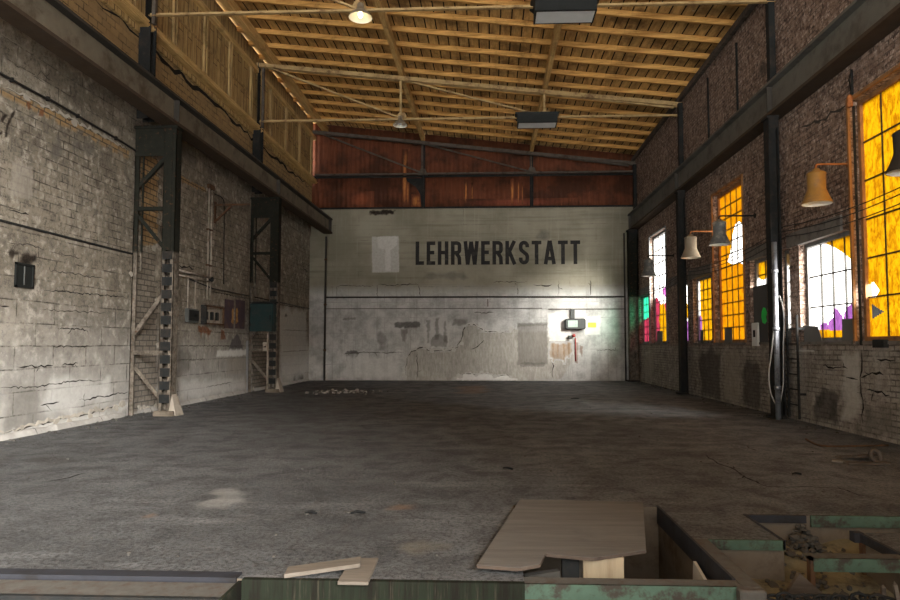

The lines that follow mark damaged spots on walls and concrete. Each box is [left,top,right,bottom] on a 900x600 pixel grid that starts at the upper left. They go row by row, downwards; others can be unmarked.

crack [2,241,127,409]
spalling [401,322,575,381]
damp [697,339,724,402]
damp [739,353,765,412]
crack [823,350,895,423]